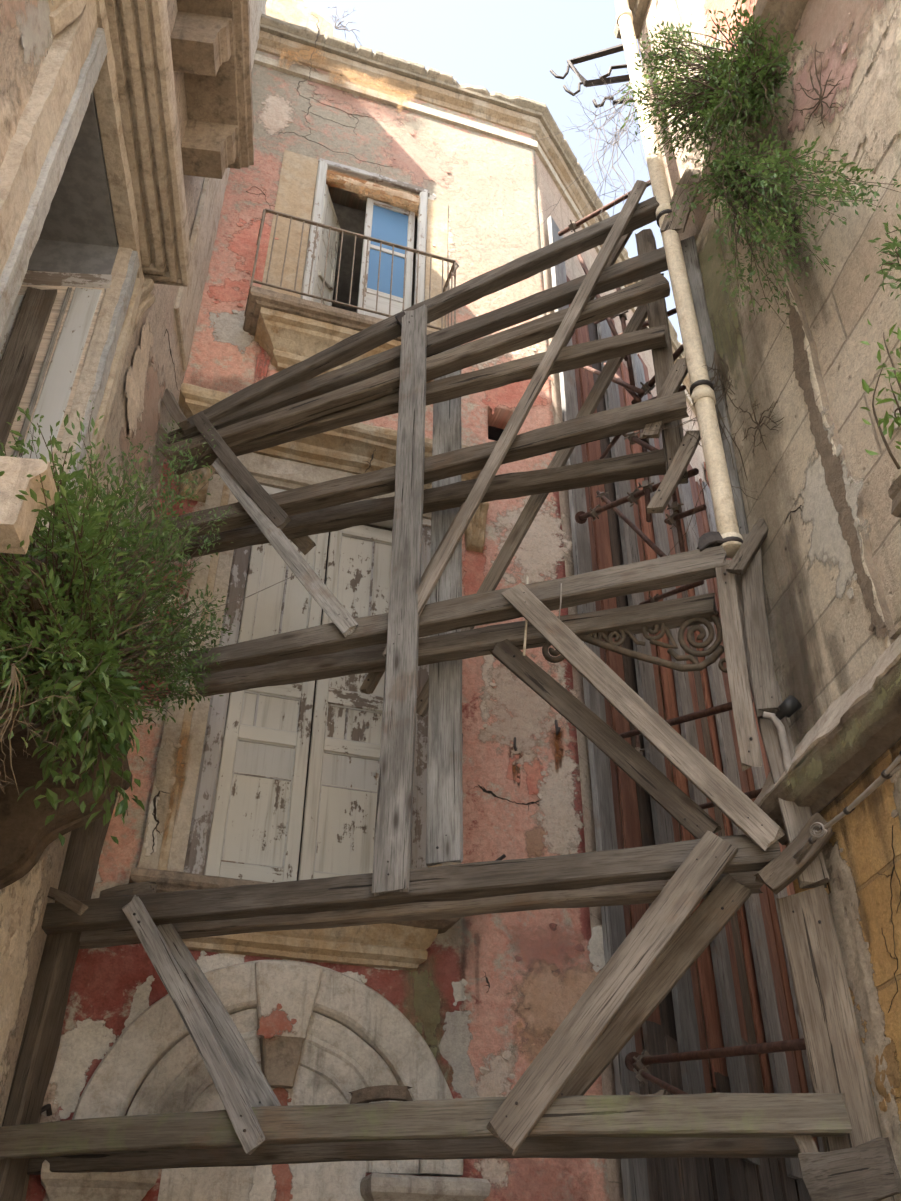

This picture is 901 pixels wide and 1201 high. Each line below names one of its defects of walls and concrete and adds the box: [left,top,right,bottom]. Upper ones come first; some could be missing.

peeling [703,0,757,49]
crack [278,14,393,168]
peeling [207,218,279,354]
peeling [462,497,572,595]
crack [473,785,541,810]
peeling [478,654,583,858]
peeling [197,950,246,973]
crack [878,825,901,1013]
peeling [40,975,155,1123]
peeling [438,979,518,1098]
peeling [248,1165,293,1201]
peeling [474,1158,509,1188]